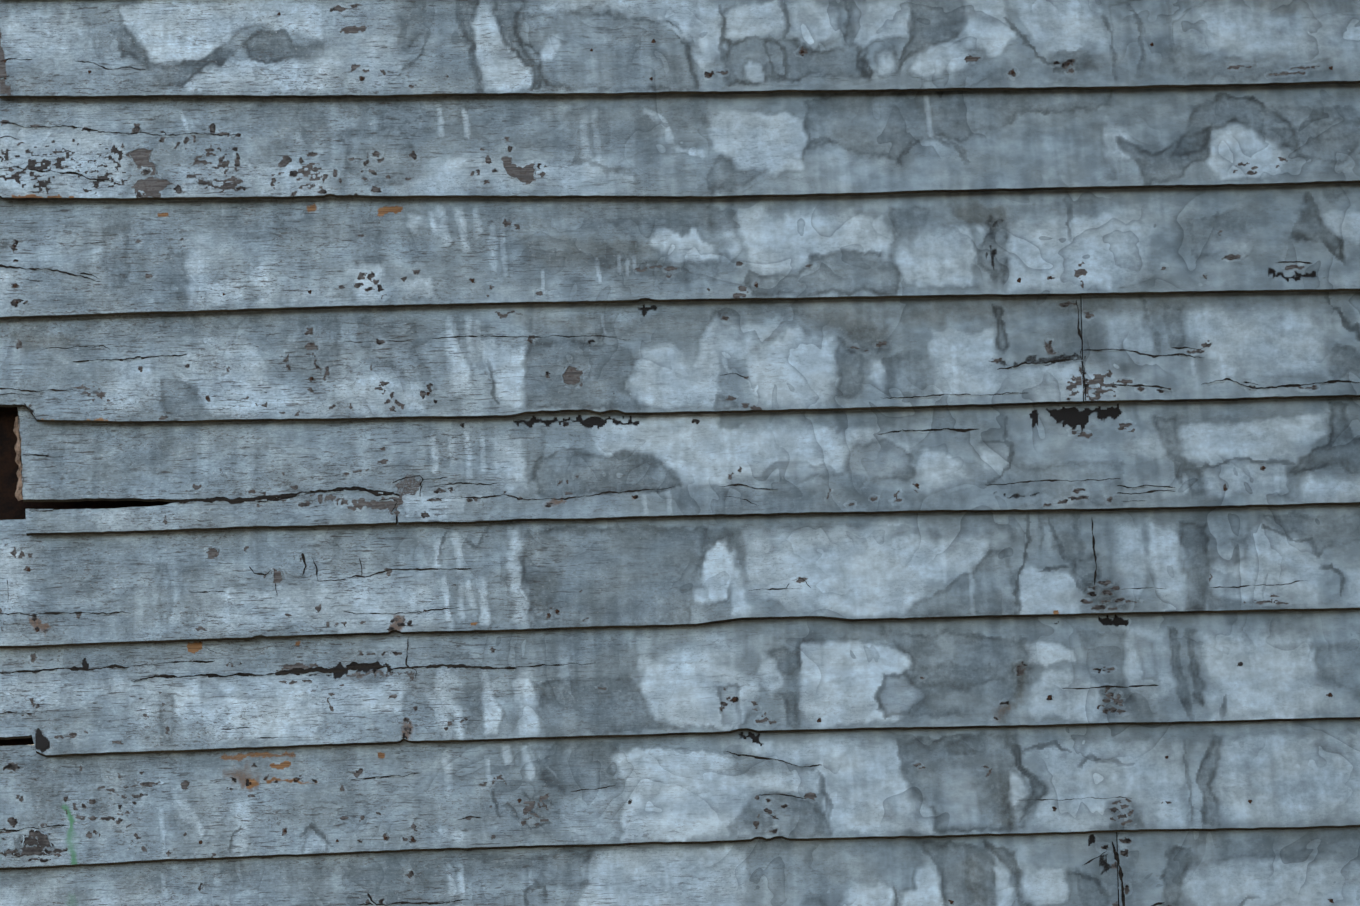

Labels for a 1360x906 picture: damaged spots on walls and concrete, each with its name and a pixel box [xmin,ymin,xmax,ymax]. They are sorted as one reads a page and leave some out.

water stain [0,0,1360,198]
peeling [0,121,250,198]
crack [1112,339,1360,395]
crack [168,477,672,505]
crack [344,558,471,579]
water stain [0,183,1360,906]
crack [0,580,130,616]
crack [0,607,593,684]
peeling [2,760,38,781]
corrosion [219,751,320,801]
peeling [0,792,70,865]